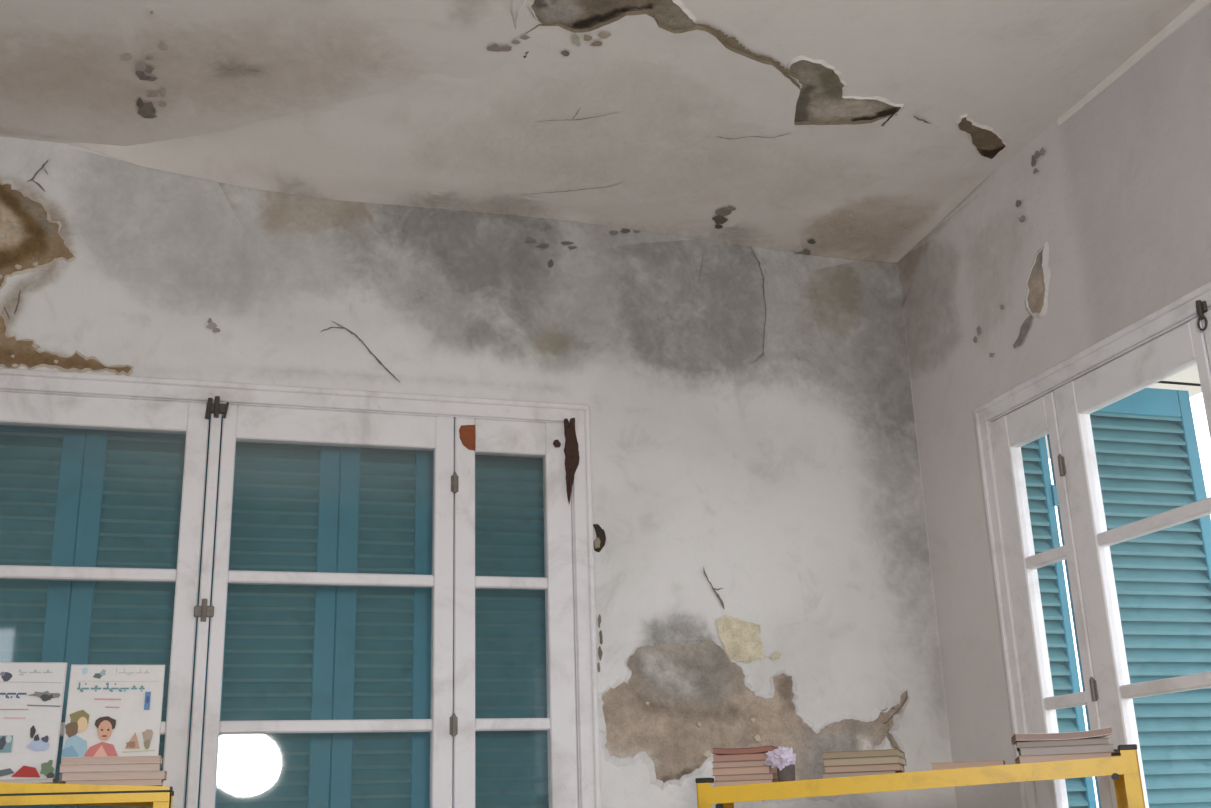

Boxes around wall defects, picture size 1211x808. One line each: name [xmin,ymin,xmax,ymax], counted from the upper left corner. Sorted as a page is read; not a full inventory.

spalling [487,0,697,58]
spalling [787,55,905,127]
spalling [955,114,1008,160]
spalling [0,178,76,290]
water stain [518,225,577,268]
spalling [1013,241,1051,349]
spalling [0,305,134,376]
crack [321,321,400,382]
rust [459,425,475,451]
spalling [593,524,606,552]
spalling [598,615,910,790]
spalling [762,795,841,805]